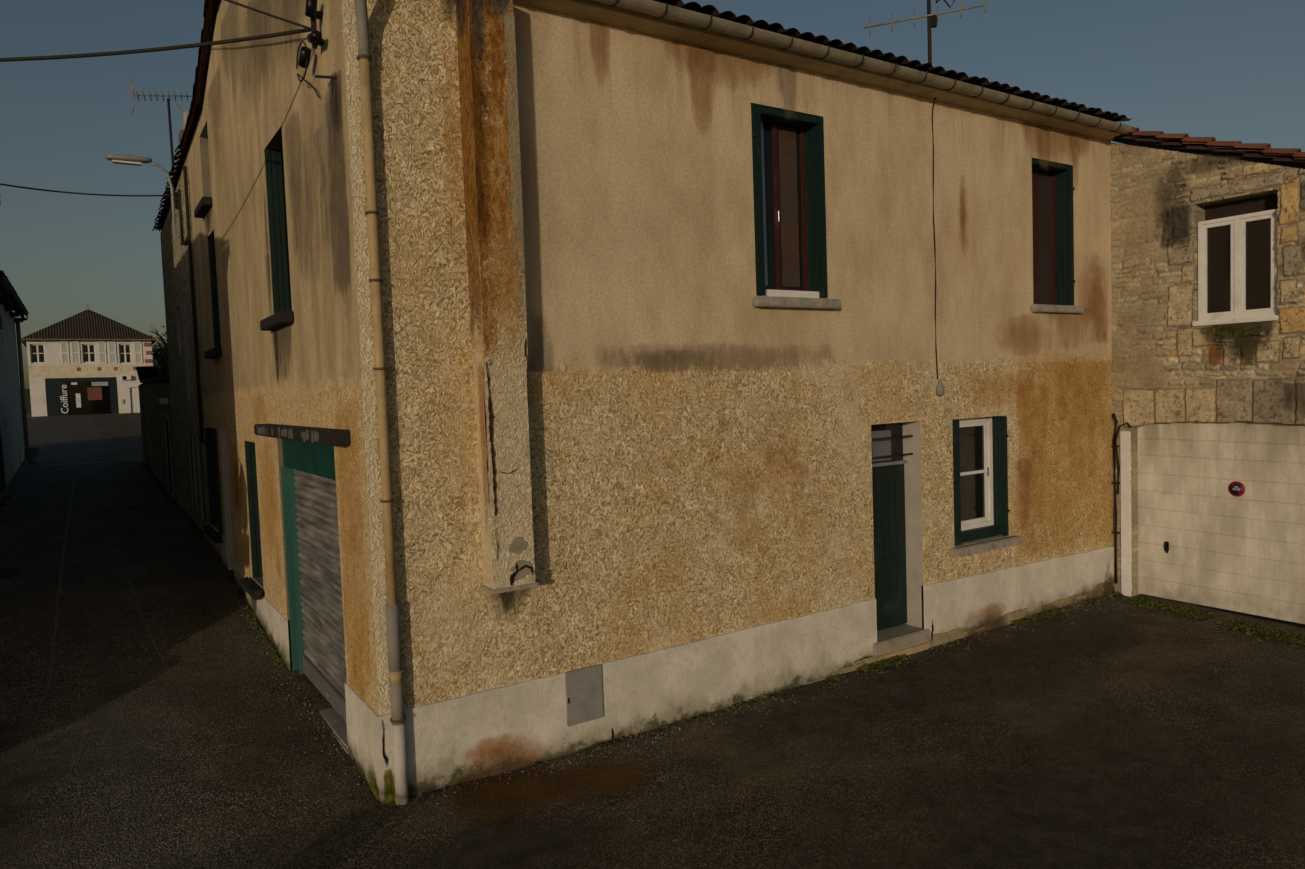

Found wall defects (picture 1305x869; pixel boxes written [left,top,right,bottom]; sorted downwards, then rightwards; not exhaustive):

leakage [303,72,336,192]
corrosion [457,0,523,343]